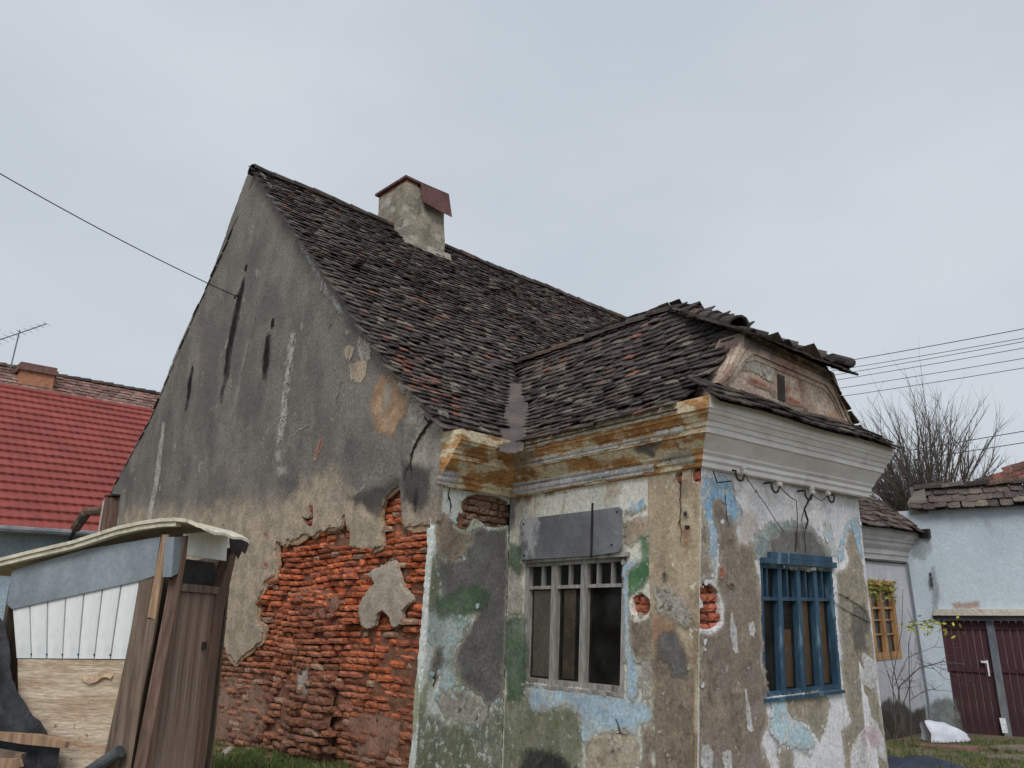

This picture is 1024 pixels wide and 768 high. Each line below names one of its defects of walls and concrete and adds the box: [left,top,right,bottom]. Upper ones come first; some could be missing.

leakage [220,280,249,419]
flaking render [344,338,371,383]
crack [403,404,455,481]
flaking render [214,406,889,768]